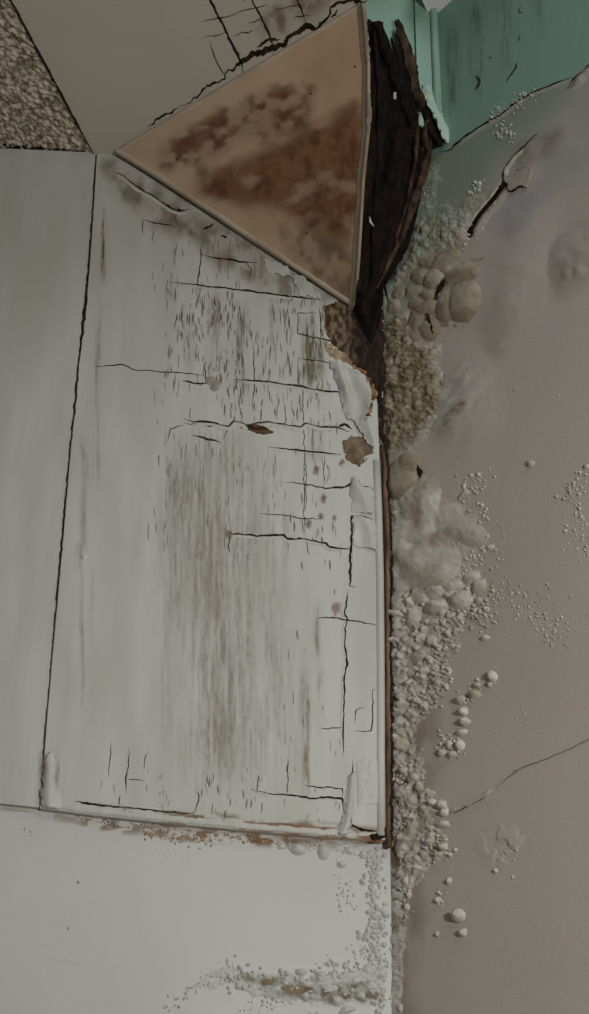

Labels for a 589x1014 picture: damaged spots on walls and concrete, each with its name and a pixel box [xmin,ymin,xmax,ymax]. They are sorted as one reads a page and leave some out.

crack [440,64,589,238]
spalling [382,161,488,316]
crack [1,0,377,832]
leakage [303,319,322,382]
peeling [329,361,377,551]
crack [448,737,589,815]